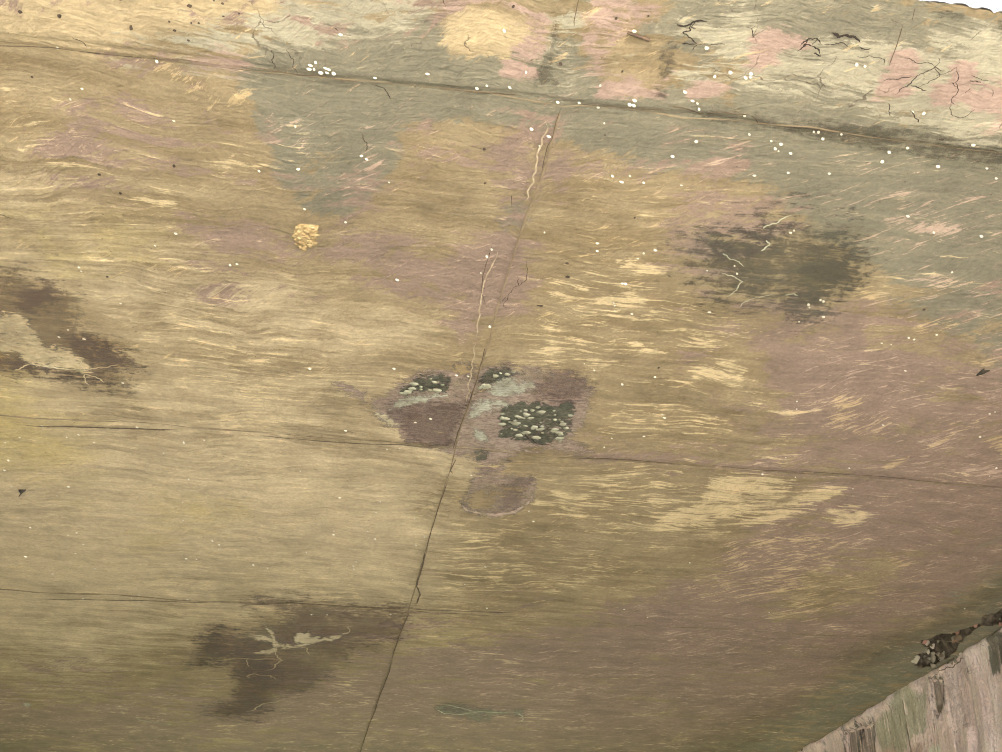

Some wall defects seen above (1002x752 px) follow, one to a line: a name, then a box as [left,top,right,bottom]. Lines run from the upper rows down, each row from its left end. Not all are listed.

crack [677,20,722,49]
crack [798,32,994,122]
water stain [0,263,145,395]
water stain [186,595,413,722]
spalling [911,609,1002,679]